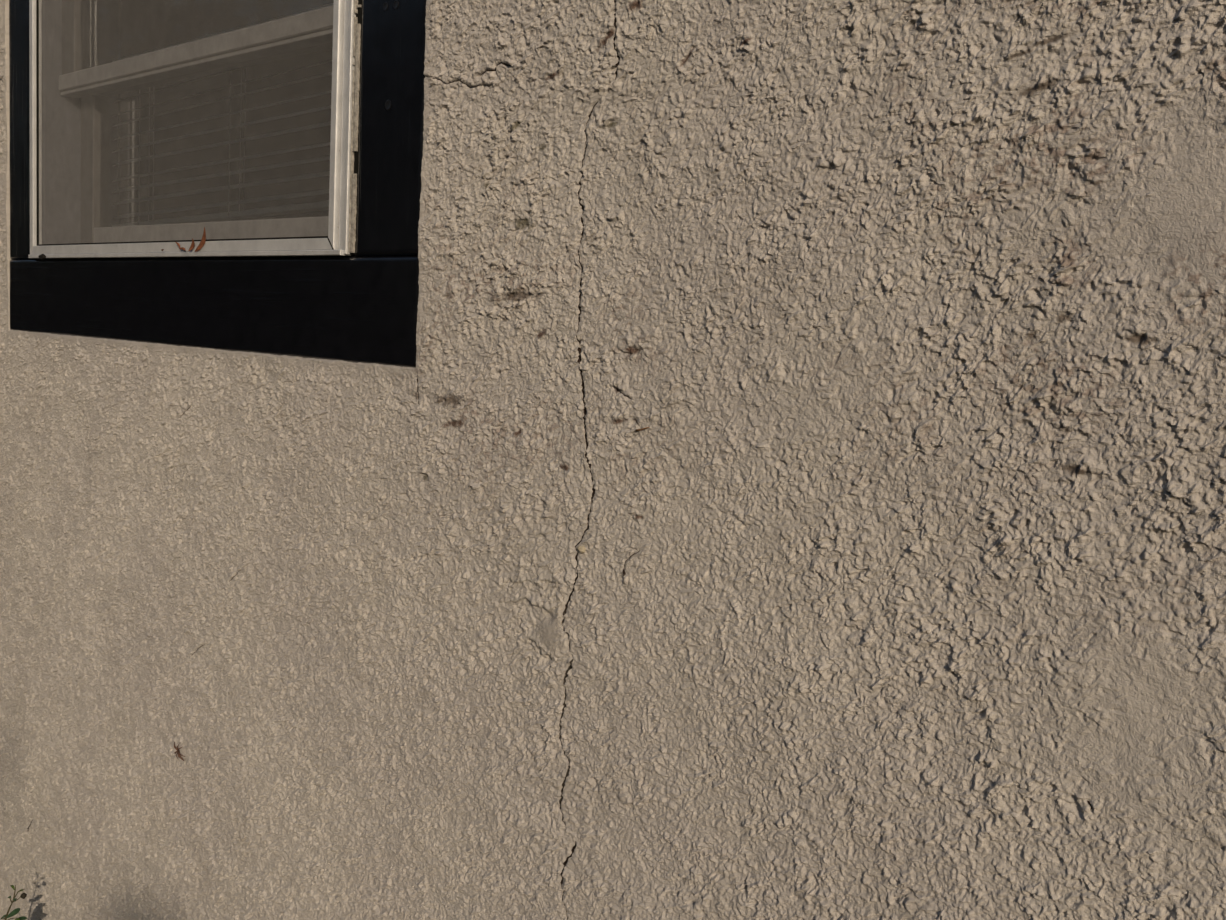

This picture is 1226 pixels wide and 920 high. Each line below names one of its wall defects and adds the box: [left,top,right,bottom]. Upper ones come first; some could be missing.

crack [559,0,620,920]